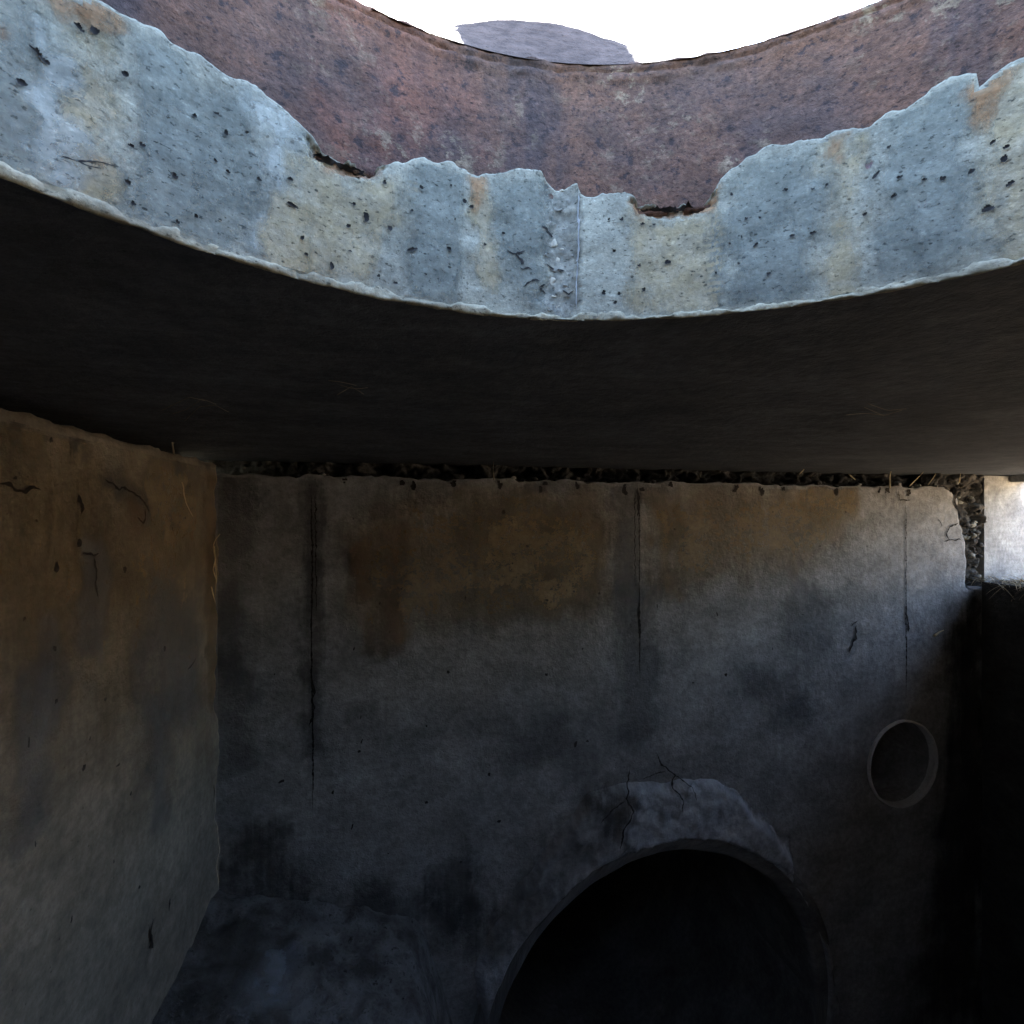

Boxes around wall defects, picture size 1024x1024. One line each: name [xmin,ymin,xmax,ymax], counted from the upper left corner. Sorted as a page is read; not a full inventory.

crack [0,482,39,494]
crack [300,482,324,808]
crack [633,488,641,682]
crack [601,755,697,850]